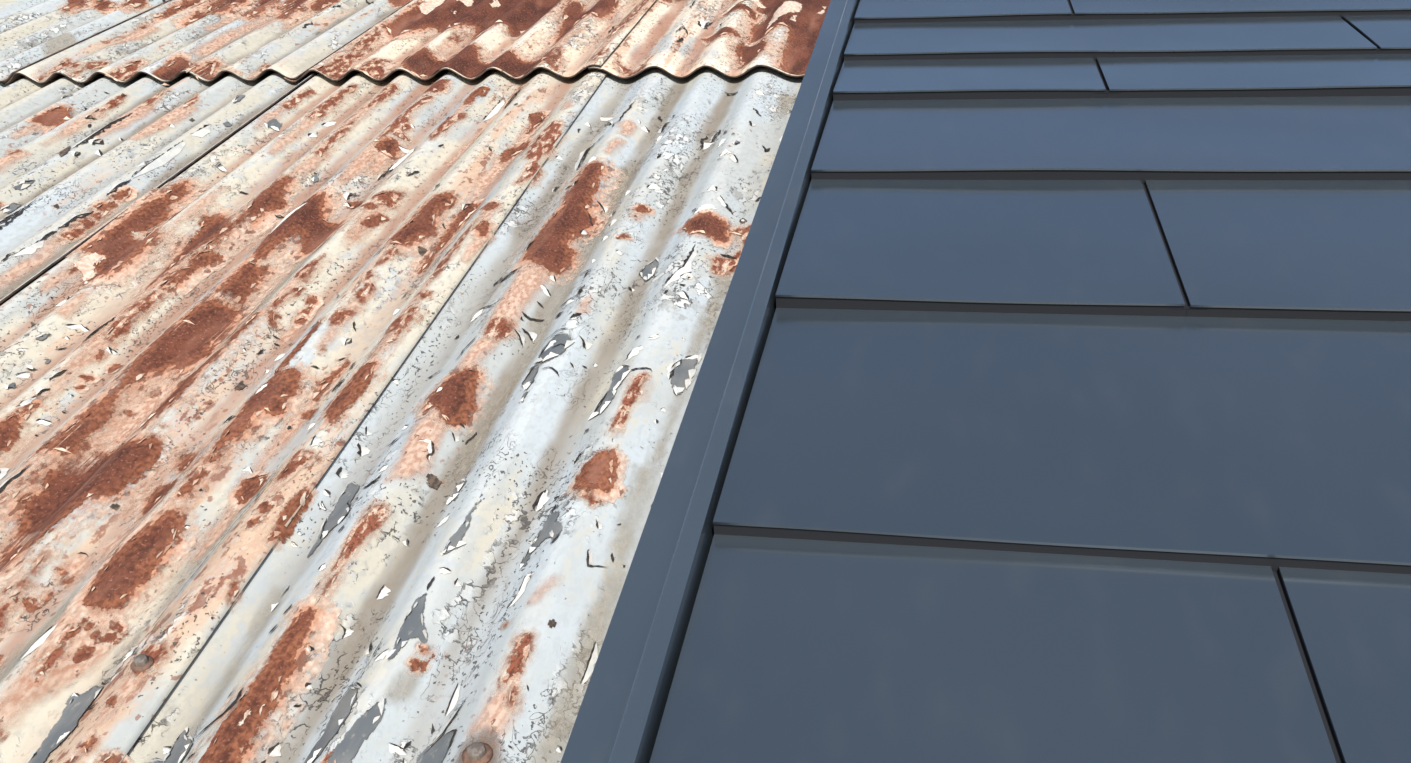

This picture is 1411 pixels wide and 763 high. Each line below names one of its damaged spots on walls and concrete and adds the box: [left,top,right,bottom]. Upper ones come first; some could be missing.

rust [700,0,831,74]
rust [678,208,751,277]
rust [0,0,679,763]
peeling [519,328,593,403]
peeling [588,345,643,420]
peeling [667,353,702,395]
peeling [426,474,467,504]
peeling [442,492,482,554]
peeling [519,505,562,568]
peeling [386,593,435,673]
peeling [304,682,386,763]
peeling [416,698,466,763]